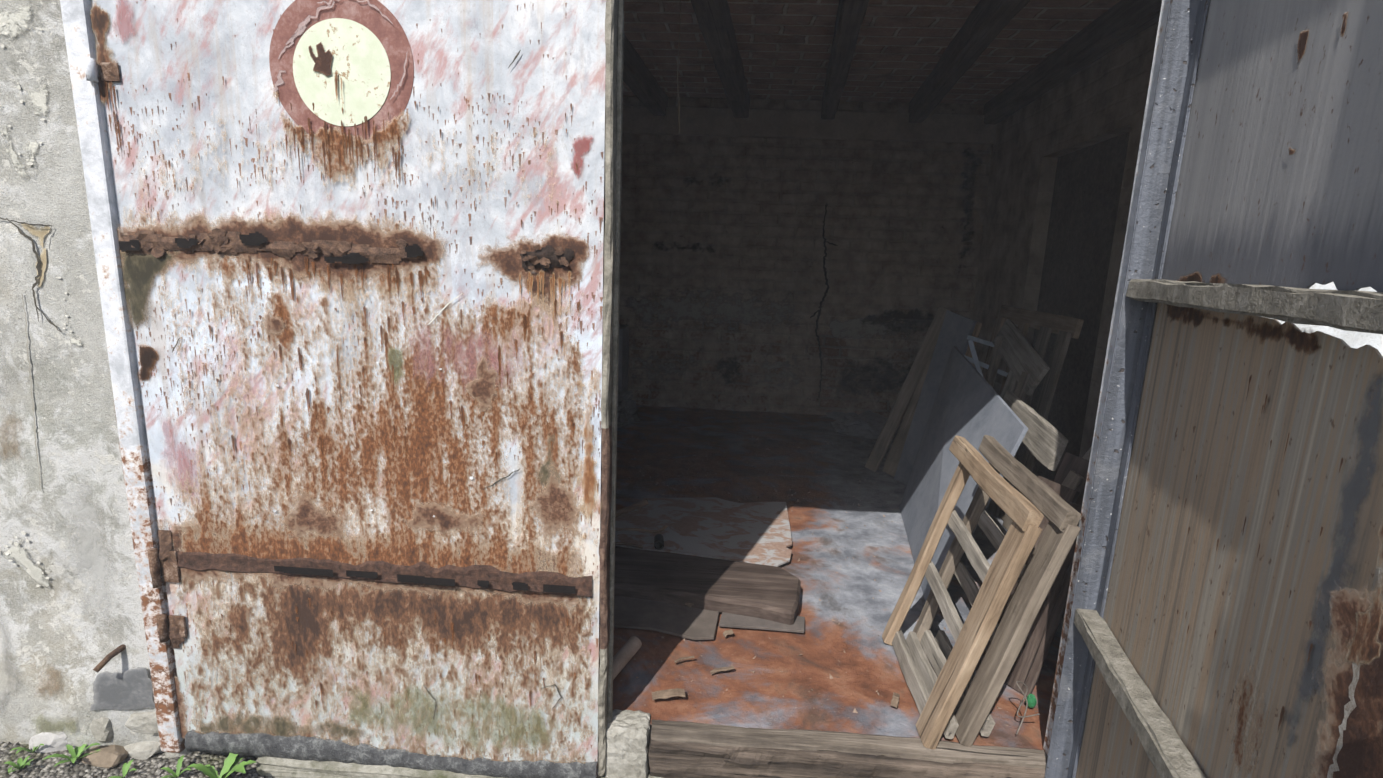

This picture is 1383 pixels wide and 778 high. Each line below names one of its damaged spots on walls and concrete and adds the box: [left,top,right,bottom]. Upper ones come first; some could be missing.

peeling [0,6,42,48]
crack [0,217,62,332]
crack [810,203,838,400]
rust [1177,271,1223,283]
rust [1167,304,1320,353]
rust [117,42,599,764]
peeling [0,531,49,587]
rust [1231,668,1285,773]
rust [1311,585,1383,778]